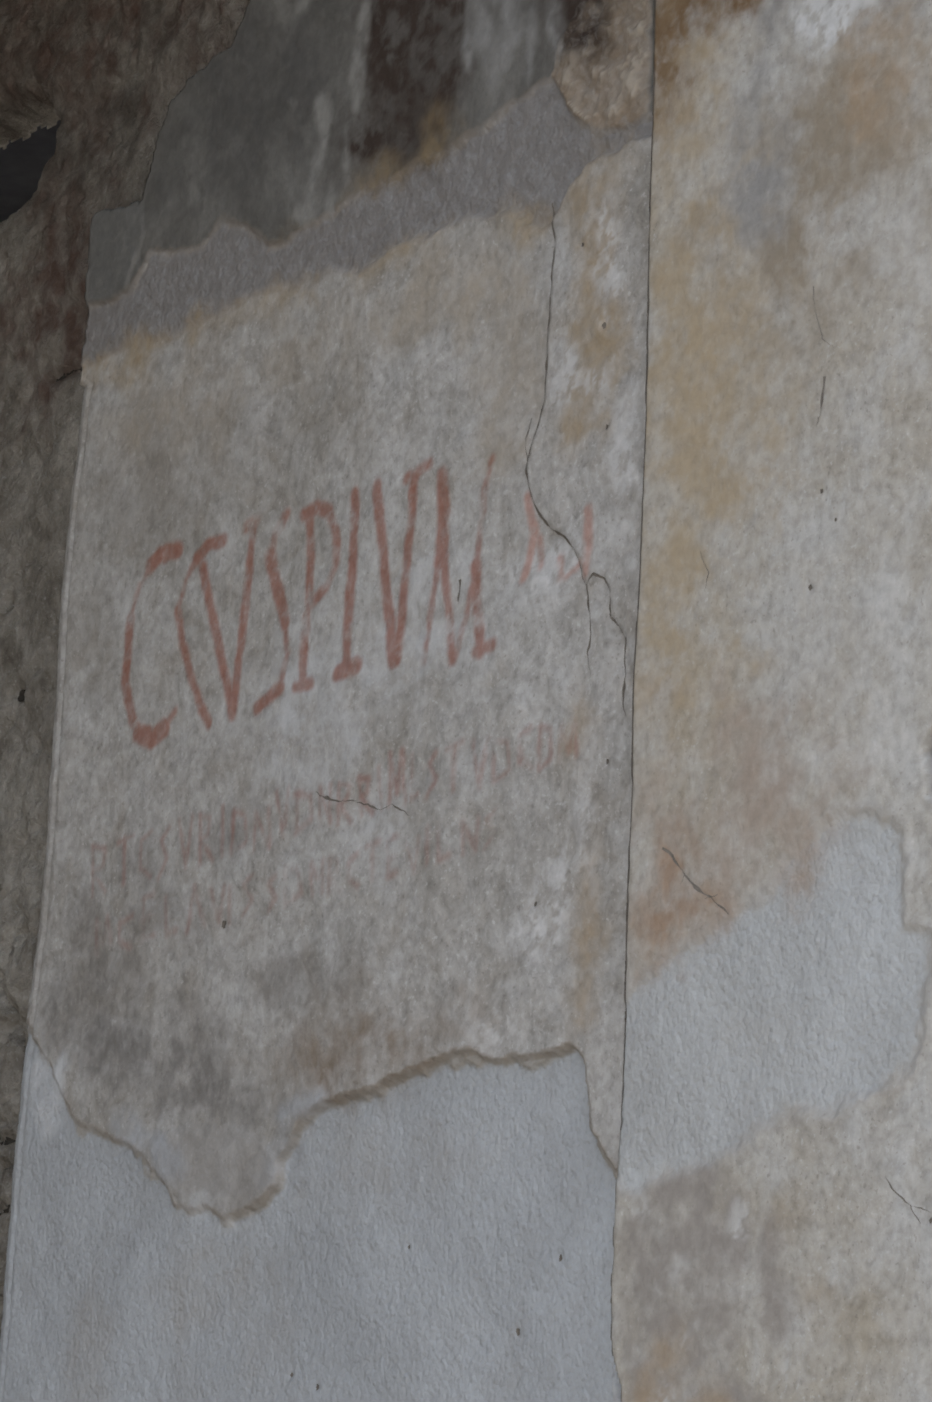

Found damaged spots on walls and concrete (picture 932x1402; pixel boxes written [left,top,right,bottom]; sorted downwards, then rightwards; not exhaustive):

crack [525,0,728,1128]
spalling [0,1014,233,1402]
spalling [264,1041,621,1402]